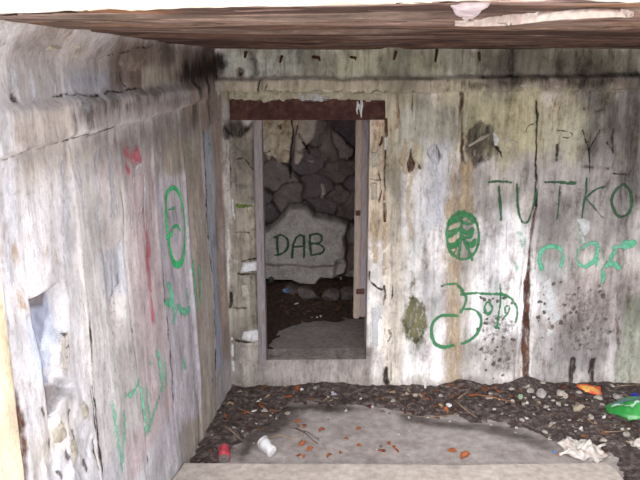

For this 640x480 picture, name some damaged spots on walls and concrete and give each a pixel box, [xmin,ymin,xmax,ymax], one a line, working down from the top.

crack [53,74,137,98]
rust [400,142,421,239]
crack [521,100,539,377]
spalling [29,293,60,417]
spalling [58,333,70,370]
spalling [48,420,87,472]